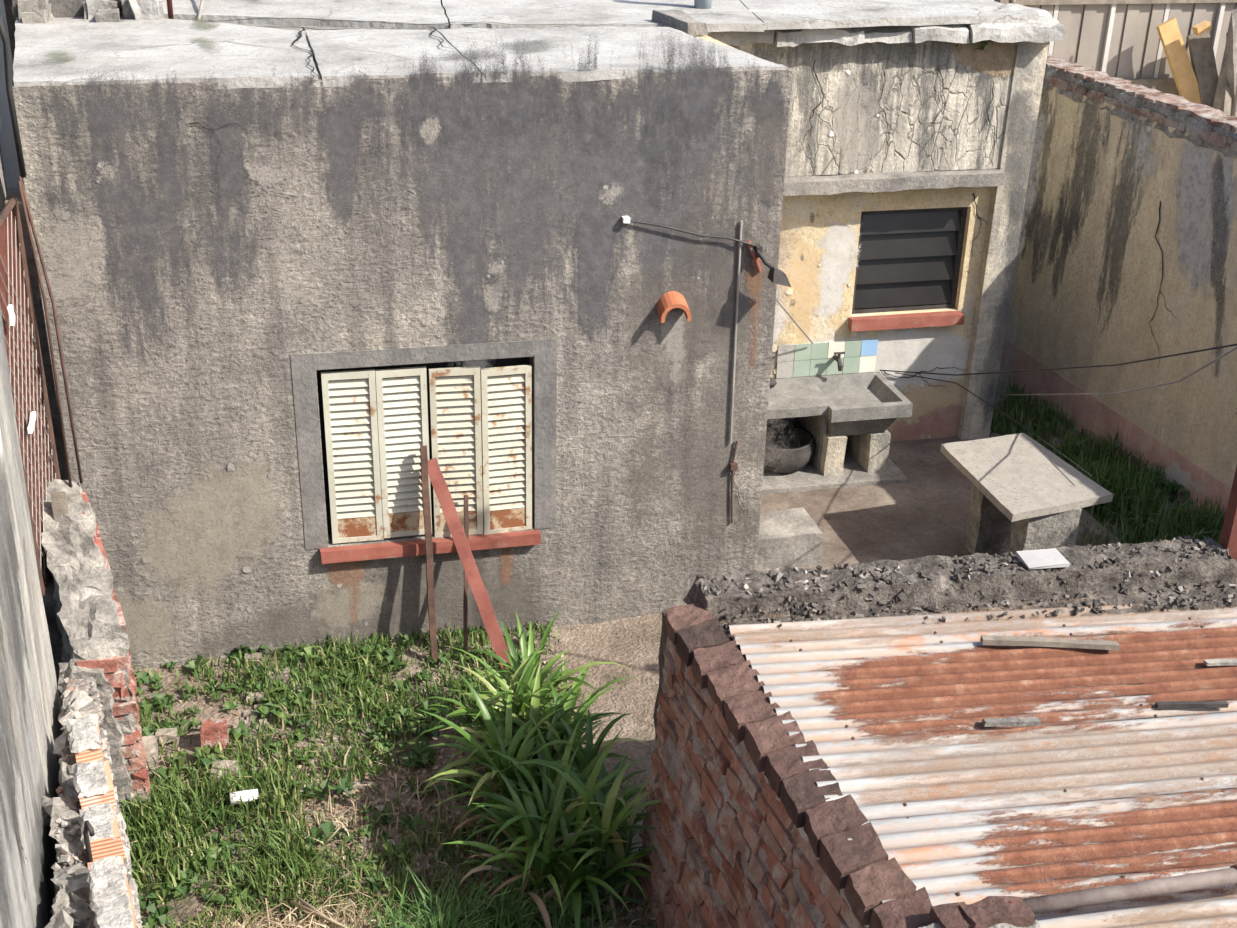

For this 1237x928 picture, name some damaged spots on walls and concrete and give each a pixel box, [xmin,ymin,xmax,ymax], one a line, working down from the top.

leakage [31,24,1155,573]
peeling [771,242,793,379]
crack [797,60,837,171]
peeling [813,217,861,321]
peeling [812,327,971,392]
crack [872,67,998,257]
peeling [1123,114,1237,304]
leakage [1209,154,1230,379]
leakage [0,430,55,928]
spalling [43,677,143,928]
rust [716,595,1237,899]
rust [1035,884,1237,928]